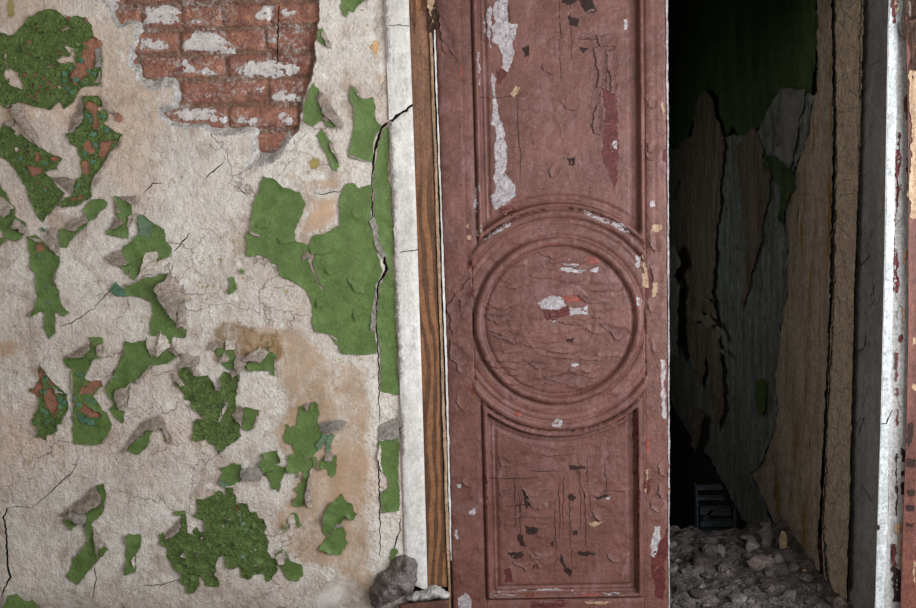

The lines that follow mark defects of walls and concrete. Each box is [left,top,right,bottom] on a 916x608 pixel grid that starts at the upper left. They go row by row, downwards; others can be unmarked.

peeling [0,9,277,455]
flaking render [99,0,399,395]
crack [274,6,282,64]
crack [371,122,388,217]
peeling [466,0,518,241]
peeling [635,0,818,524]
crack [2,455,80,595]
peeling [59,483,109,585]
peeling [159,401,347,594]
water stain [246,329,367,563]
crack [376,255,401,555]
peeling [377,417,400,514]